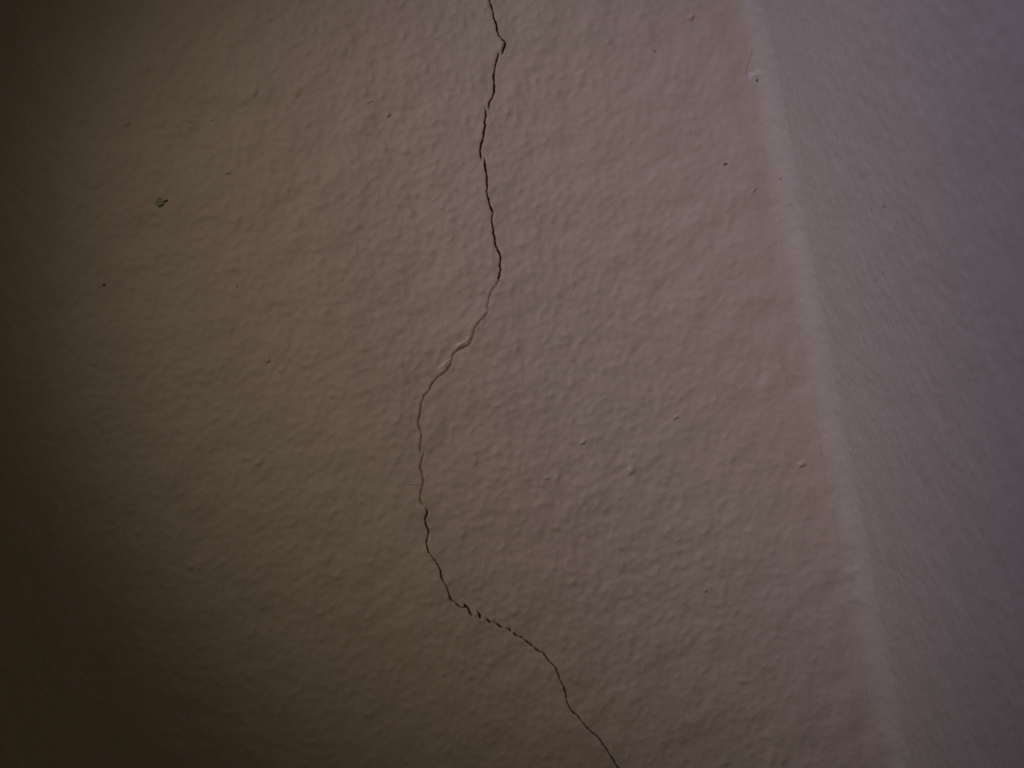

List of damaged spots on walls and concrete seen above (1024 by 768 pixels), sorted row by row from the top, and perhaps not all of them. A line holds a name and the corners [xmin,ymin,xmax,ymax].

crack [403,0,619,768]